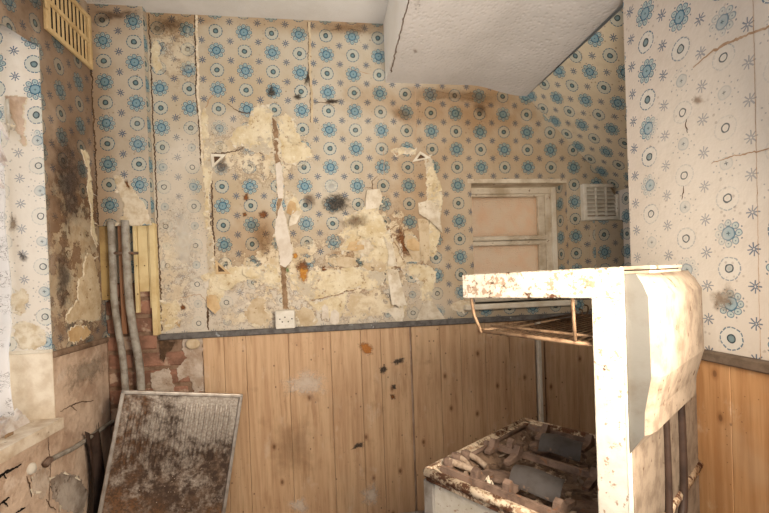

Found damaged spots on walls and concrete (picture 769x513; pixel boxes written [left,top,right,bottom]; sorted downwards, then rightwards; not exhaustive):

mould [60,150,78,215]
leakage [323,195,348,212]
leakage [58,259,69,304]
flaking render [65,253,204,441]
crack [0,442,56,513]
spalling [30,467,87,513]